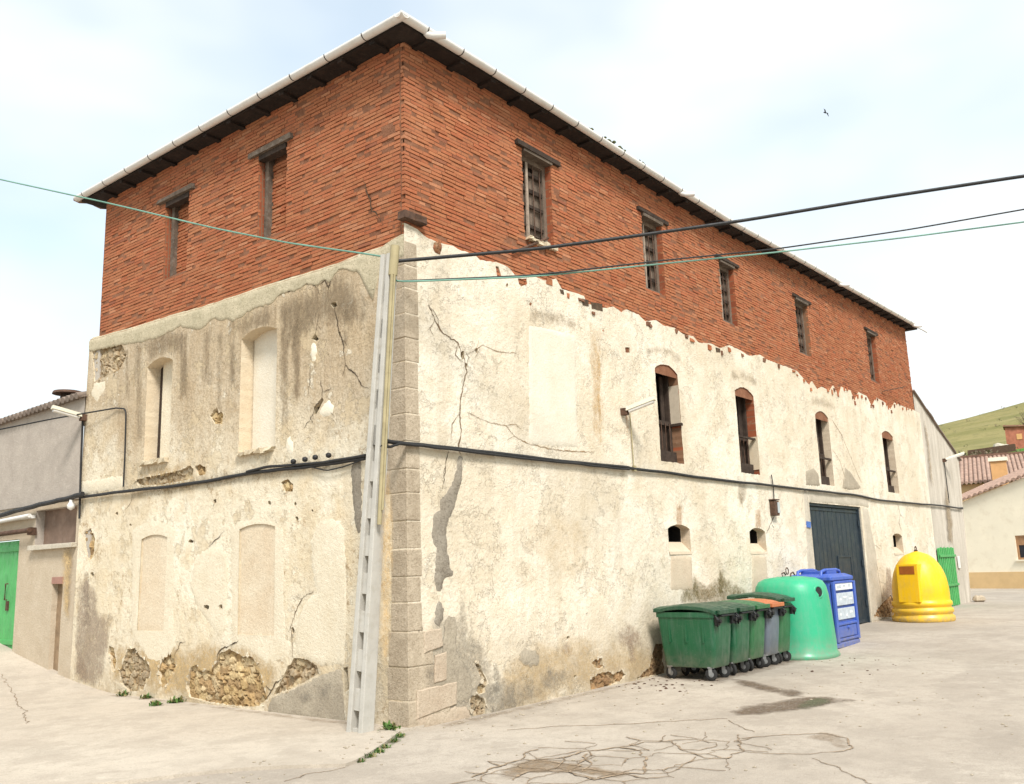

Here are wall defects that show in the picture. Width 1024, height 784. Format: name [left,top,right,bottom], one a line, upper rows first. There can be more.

spalling [582,299,603,311]
flaking render [93,343,128,380]
damp [149,335,187,390]
damp [281,278,364,397]
crack [278,280,368,428]
crack [428,305,589,483]
flaking render [133,464,206,486]
flaking render [108,646,176,691]
flaking render [185,650,319,707]
flaking render [469,660,488,716]
flaking render [590,656,623,689]
crack [451,732,854,784]